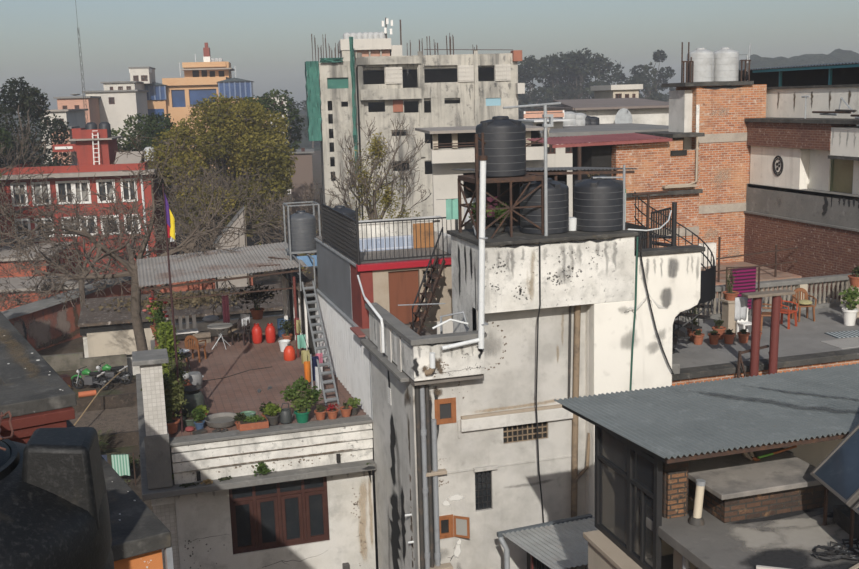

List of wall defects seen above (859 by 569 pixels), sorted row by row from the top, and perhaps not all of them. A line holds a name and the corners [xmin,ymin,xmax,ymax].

water stain [499,237,622,248]
water stain [669,259,678,277]
water stain [662,289,671,308]
water stain [389,415,406,569]